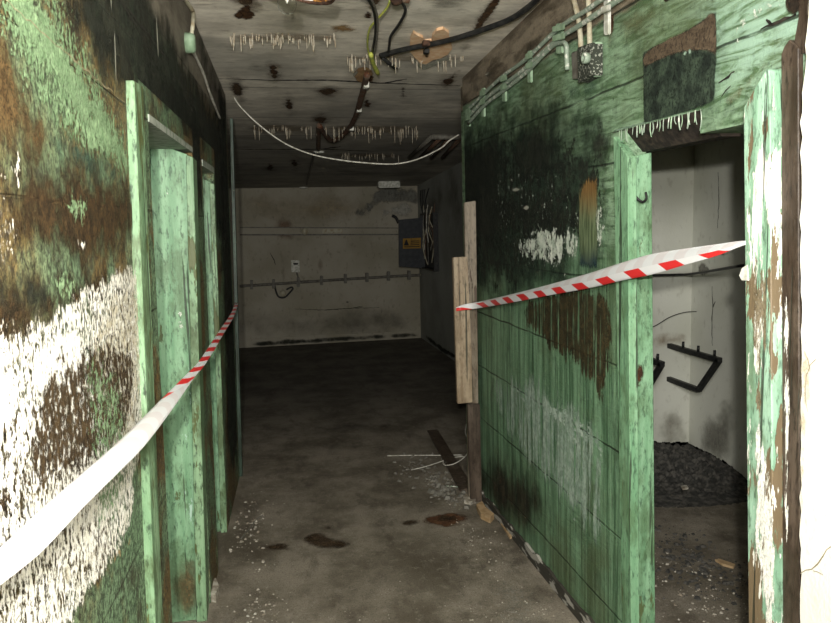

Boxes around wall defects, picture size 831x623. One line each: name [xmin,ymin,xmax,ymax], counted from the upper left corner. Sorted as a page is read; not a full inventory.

water stain [643,13,716,122]
water stain [0,41,133,309]
peeling [518,227,578,267]
water stain [0,274,56,341]
water stain [526,288,612,405]
water stain [0,333,134,547]
peeling [753,269,775,623]
water stain [305,527,345,548]